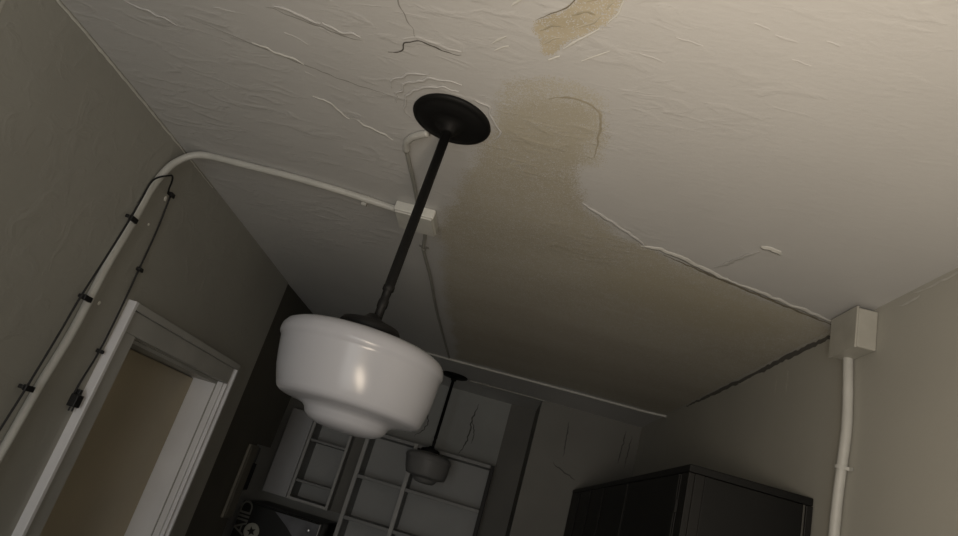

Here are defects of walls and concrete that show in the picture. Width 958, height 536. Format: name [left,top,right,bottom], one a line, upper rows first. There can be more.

crack [392,0,461,56]
flaking render [532,0,625,61]
leakage [434,75,831,415]